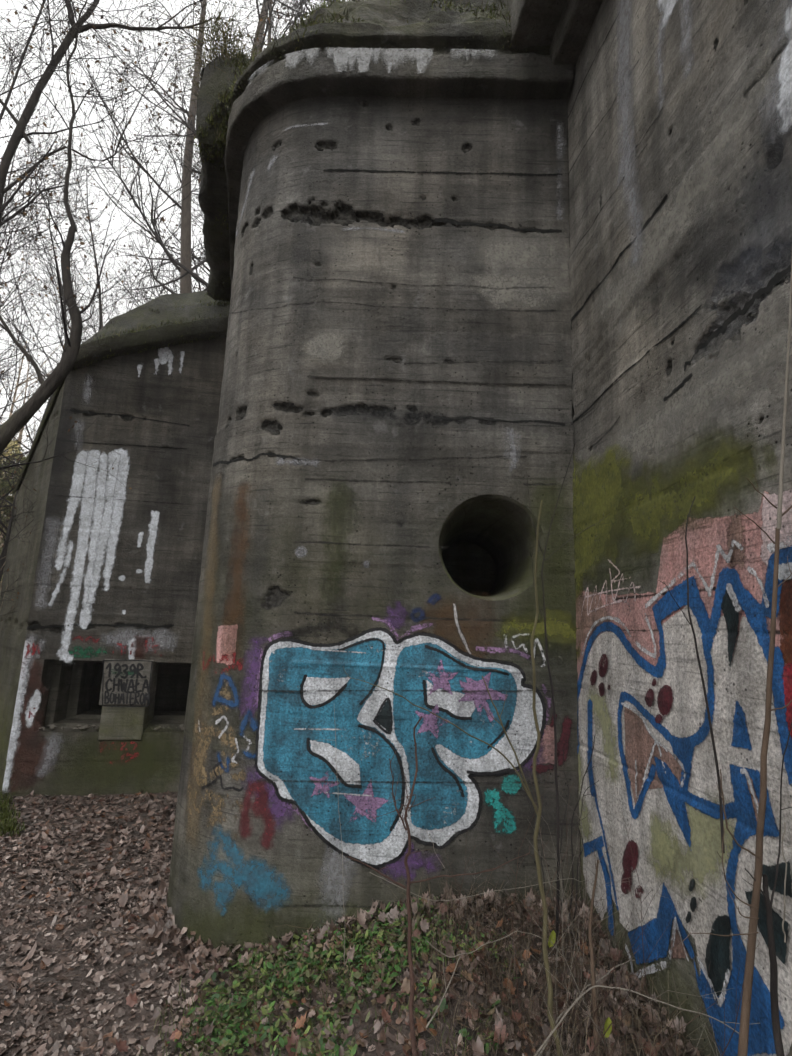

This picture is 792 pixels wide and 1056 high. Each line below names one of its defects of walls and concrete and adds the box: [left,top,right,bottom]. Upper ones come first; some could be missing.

damp [598,0,792,316]
spalling [242,199,504,237]
crack [434,265,791,426]
crack [307,359,567,386]
spalling [226,407,247,428]
spalling [261,392,465,434]
crack [213,453,527,483]
damp [495,322,792,657]
spalling [260,586,290,609]